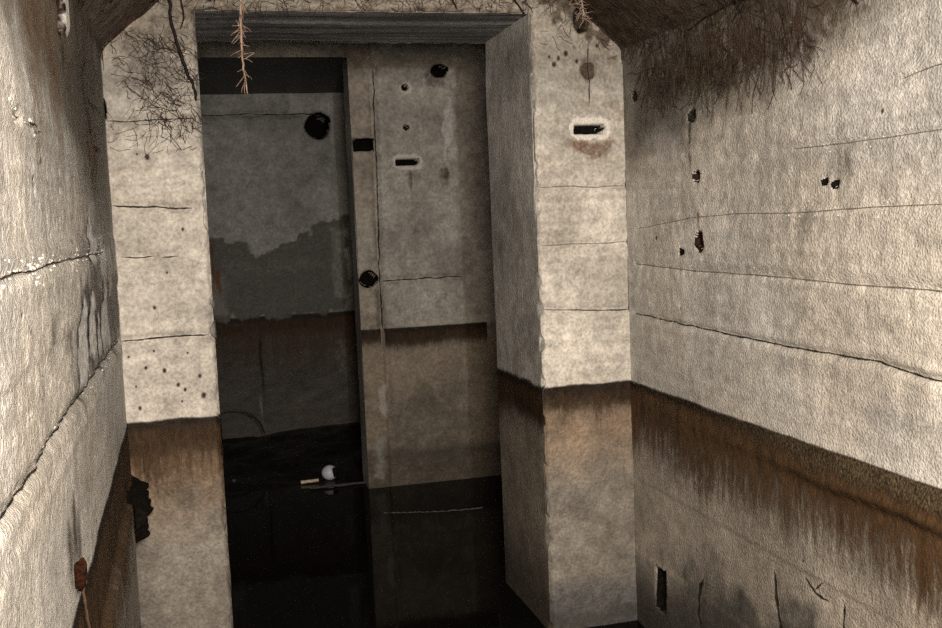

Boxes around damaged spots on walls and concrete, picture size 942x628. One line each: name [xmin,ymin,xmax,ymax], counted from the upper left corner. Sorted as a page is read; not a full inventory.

crack [8,97,41,137]
crack [0,237,175,297]
leakage [69,217,120,393]
crack [0,332,209,519]
leakage [497,369,942,613]
crack [544,305,942,382]